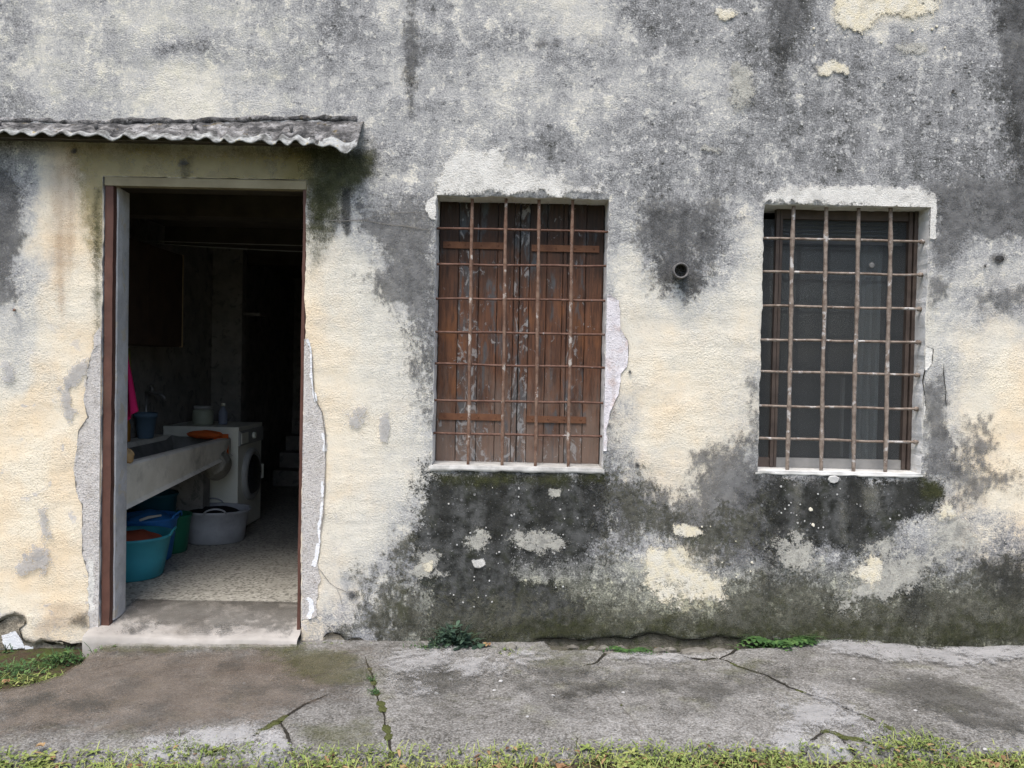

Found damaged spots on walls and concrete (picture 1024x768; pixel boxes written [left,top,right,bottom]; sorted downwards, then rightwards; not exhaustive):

peeling [816,60,849,76]
peeling [832,0,942,54]
damp [0,164,26,303]
damp [70,146,306,269]
damp [341,189,435,426]
peeling [603,294,632,451]
peeling [57,328,101,629]
peeling [301,339,327,619]
peeling [464,529,491,568]
damp [0,374,1024,768]
peeling [507,528,565,556]
peeling [639,523,737,610]